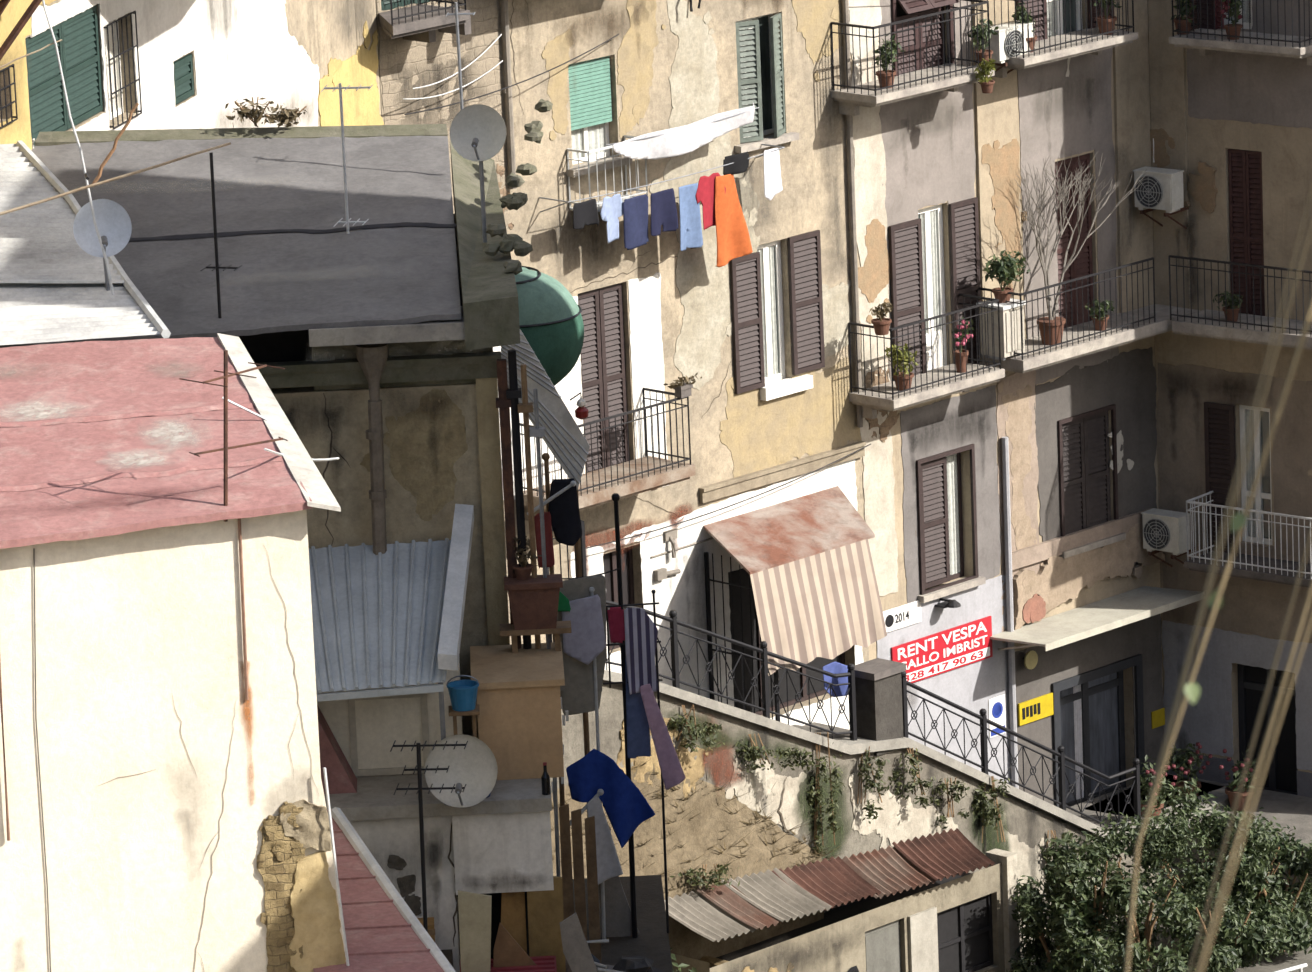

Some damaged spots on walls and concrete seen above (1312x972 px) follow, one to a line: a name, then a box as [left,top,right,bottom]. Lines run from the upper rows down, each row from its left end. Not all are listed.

peeling [315,21,384,126]
spalling [496,163,514,229]
peeling [981,139,1027,288]
peeling [720,219,899,478]
crack [322,393,350,546]
crack [264,546,319,794]
crack [172,695,236,972]
spalling [256,799,346,972]
spalling [700,956,794,972]